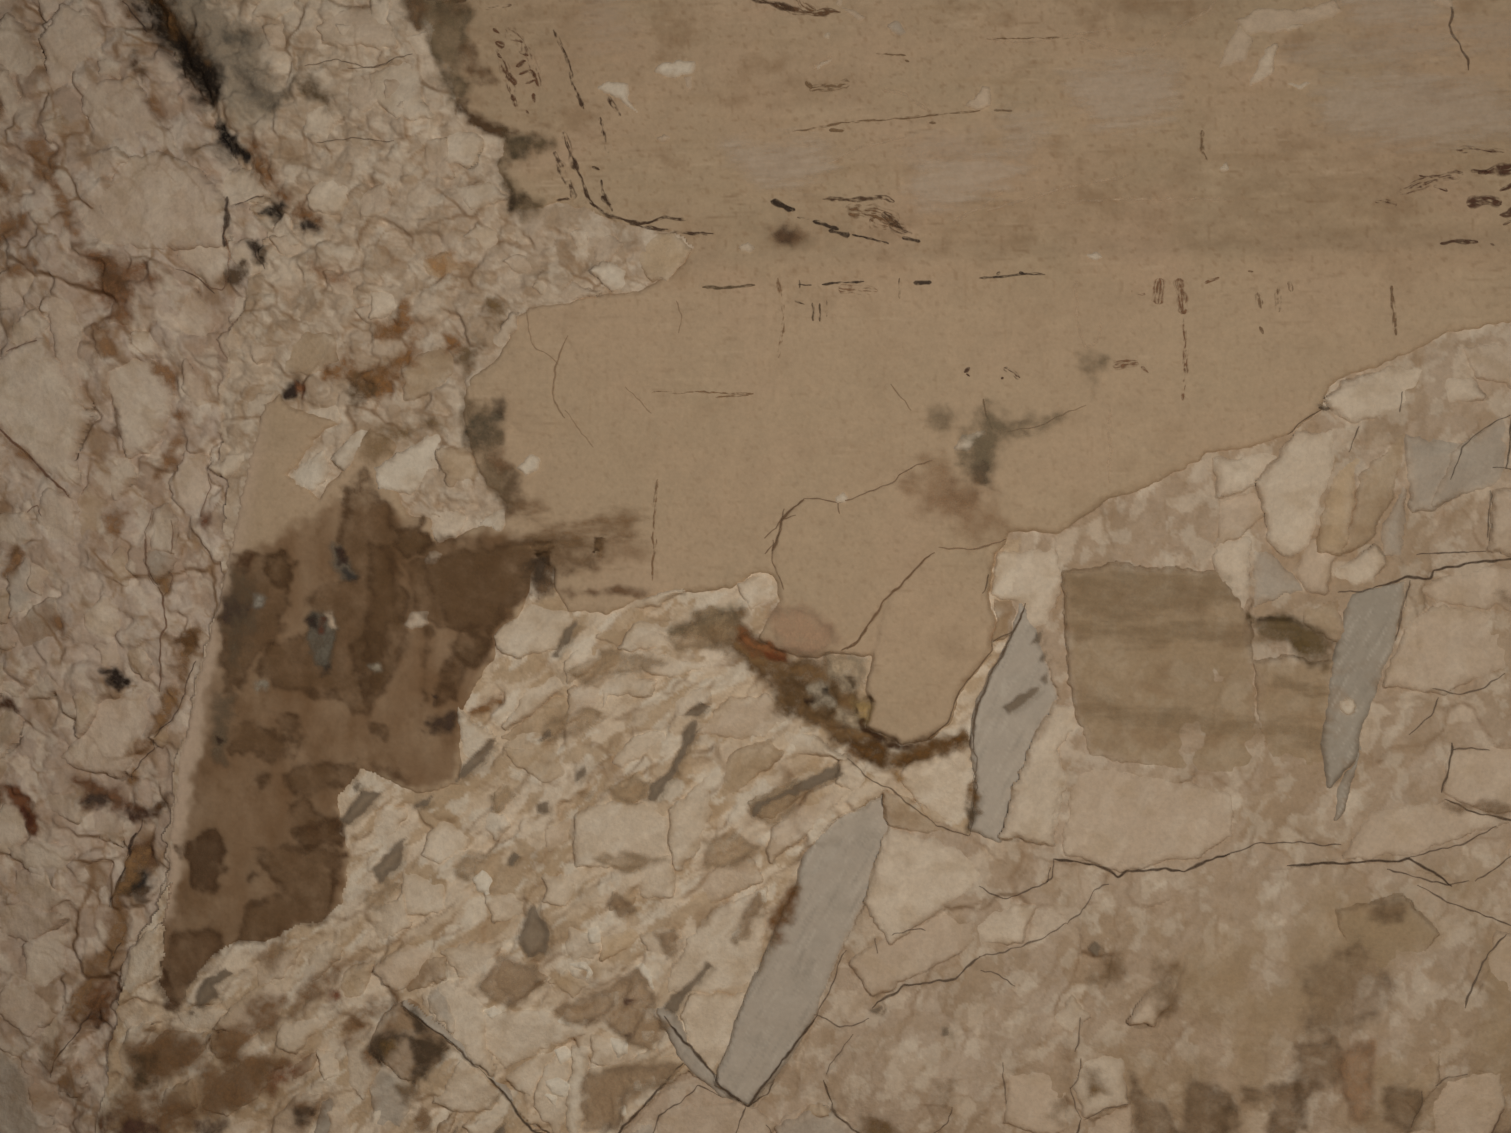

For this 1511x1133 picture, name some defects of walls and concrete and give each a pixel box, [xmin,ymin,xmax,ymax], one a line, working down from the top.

leakage [132,0,327,109]
crack [177,196,265,294]
leakage [217,123,321,229]
spalling [0,0,696,1133]
leakage [300,474,640,735]
spalling [96,322,1511,1133]
corrosion [670,606,969,782]
crack [847,603,1026,836]
corrosion [967,784,979,829]
crack [618,673,1511,1133]
crack [1339,415,1511,641]
leakage [110,965,341,1133]